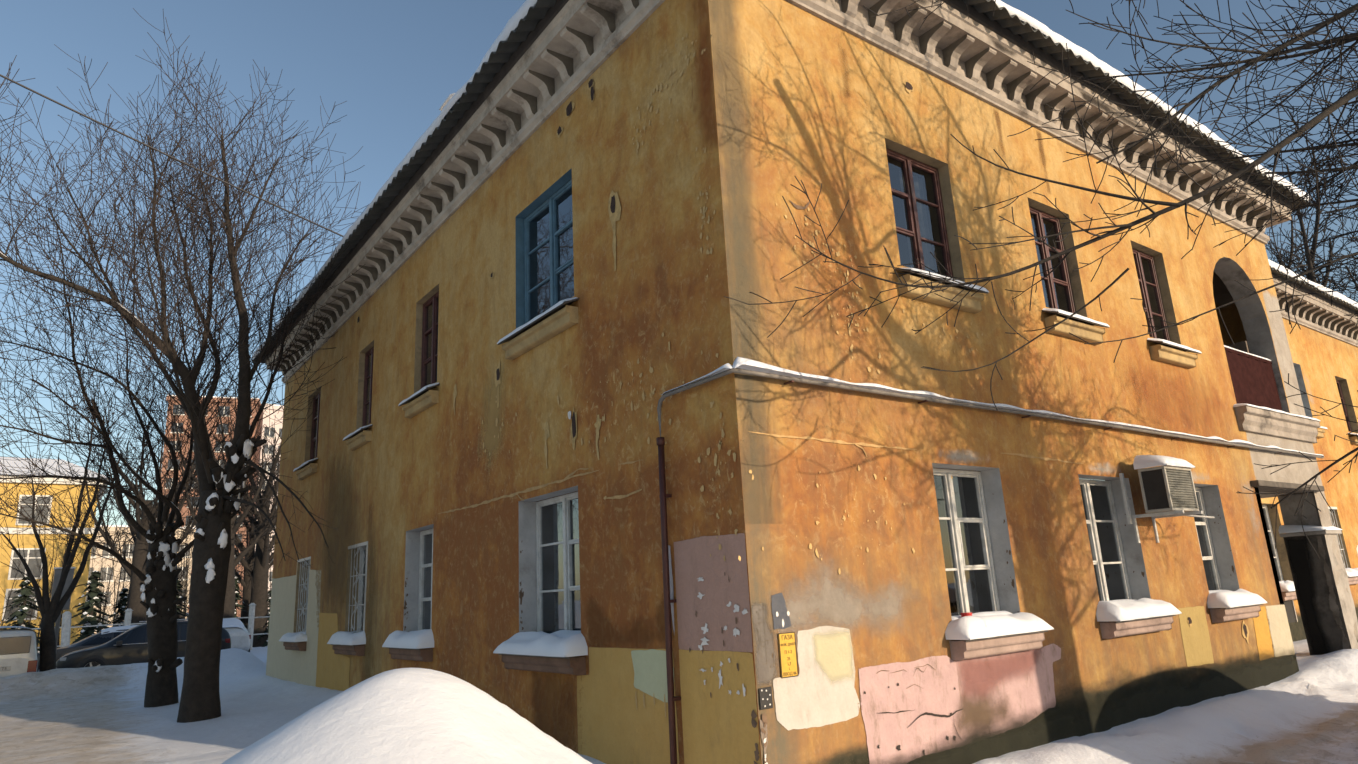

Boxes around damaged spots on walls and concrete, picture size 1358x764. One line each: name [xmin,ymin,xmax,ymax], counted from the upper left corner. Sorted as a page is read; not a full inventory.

peeling [557,358,679,460]
peeling [698,401,744,561]
damp [781,576,900,631]
crack [881,708,964,740]
damp [959,651,1037,729]